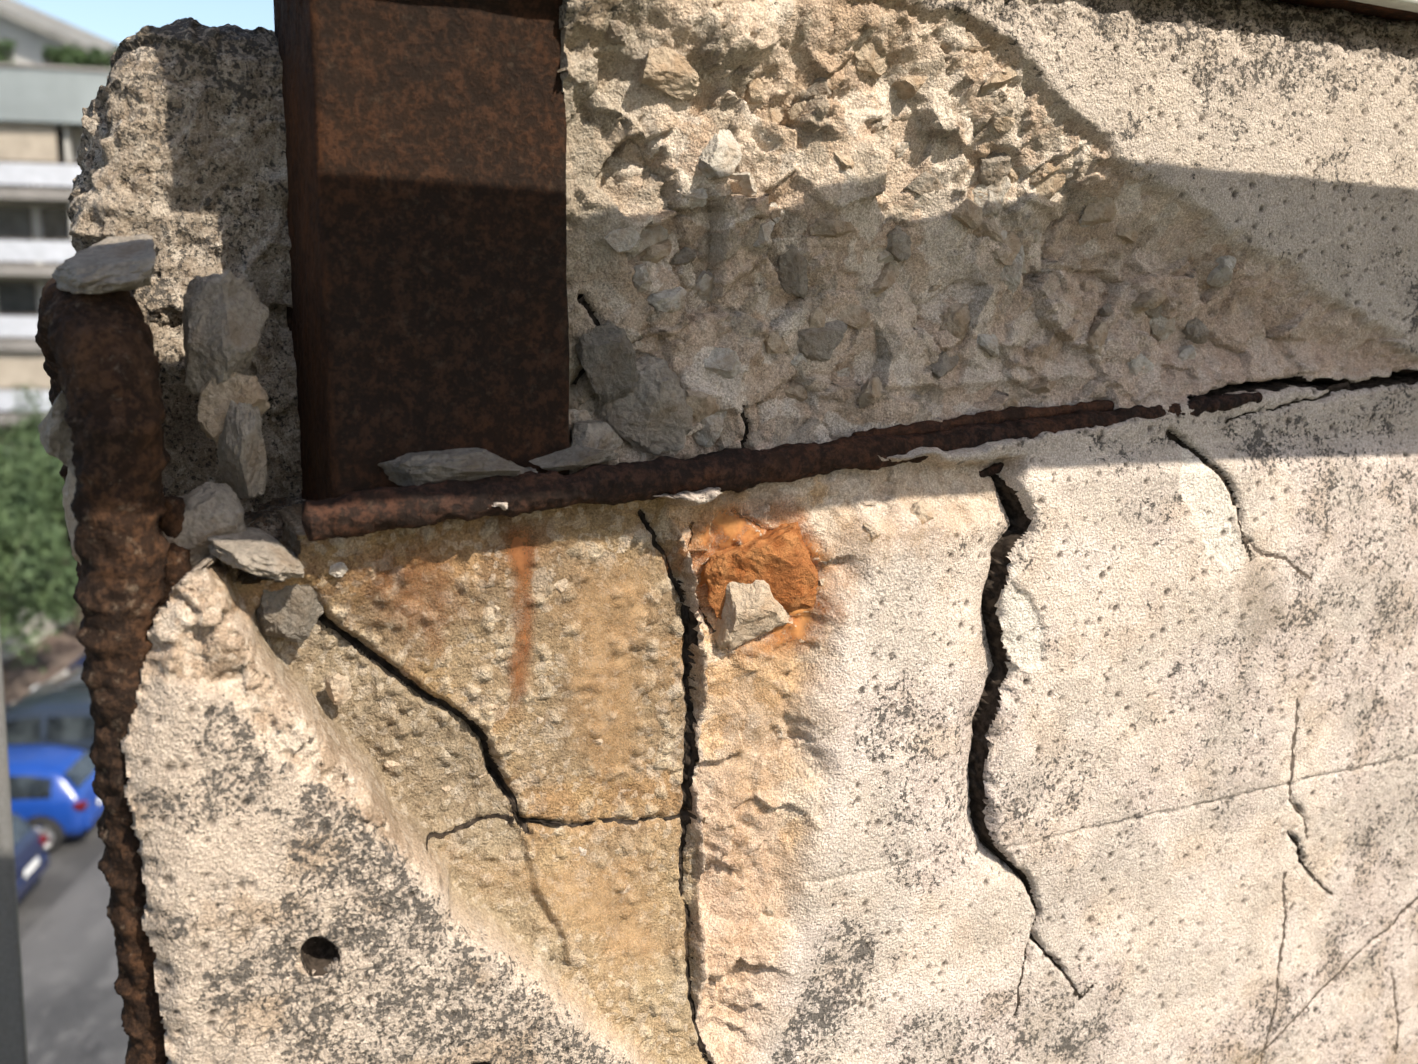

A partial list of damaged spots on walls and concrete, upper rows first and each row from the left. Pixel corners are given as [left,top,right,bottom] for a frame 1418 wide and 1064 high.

spalling [558,0,1418,474]
corrosion [158,496,192,607]
corrosion [696,506,825,607]
corrosion [767,589,829,649]
corrosion [851,400,1114,437]
corrosion [979,462,1004,478]
spalling [1179,445,1243,571]
crack [1165,430,1312,581]
crack [1187,369,1418,423]
crack [318,509,716,1064]
spalling [147,431,1062,1064]
crack [968,474,1094,1016]